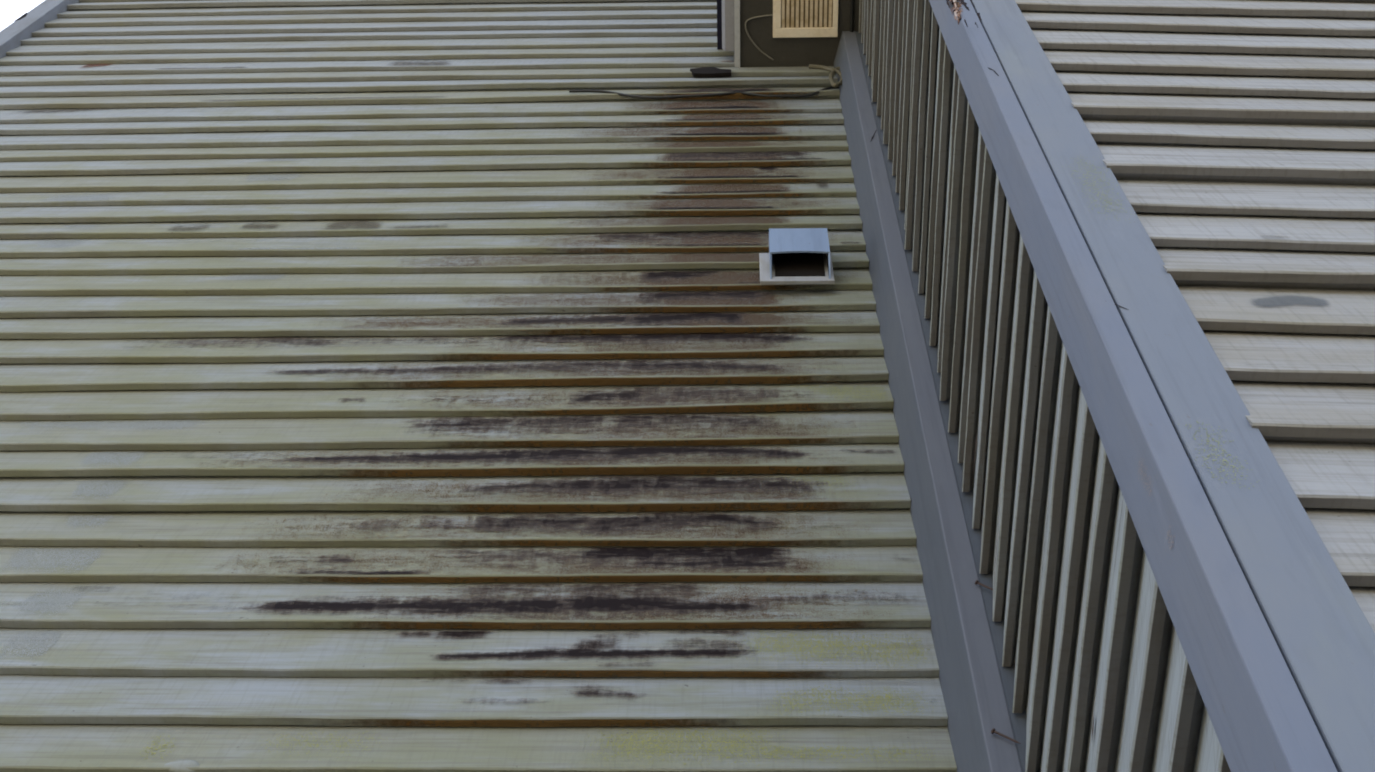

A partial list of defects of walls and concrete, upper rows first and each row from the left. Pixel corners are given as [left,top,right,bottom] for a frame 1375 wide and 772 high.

water stain [35,224,99,250]
water stain [174,88,895,697]
water stain [364,719,717,727]